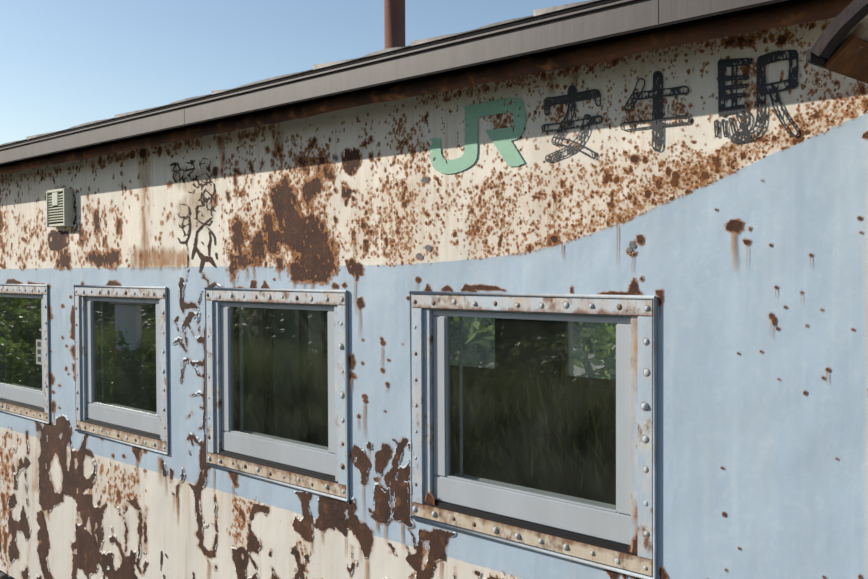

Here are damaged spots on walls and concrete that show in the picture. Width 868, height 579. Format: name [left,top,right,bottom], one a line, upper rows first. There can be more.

crack [170,158,217,281]
corrosion [0,19,868,319]
peeling [159,267,222,572]
corrosion [348,353,363,387]
peeling [0,414,148,579]
peeling [231,504,271,579]
peeling [290,438,457,579]